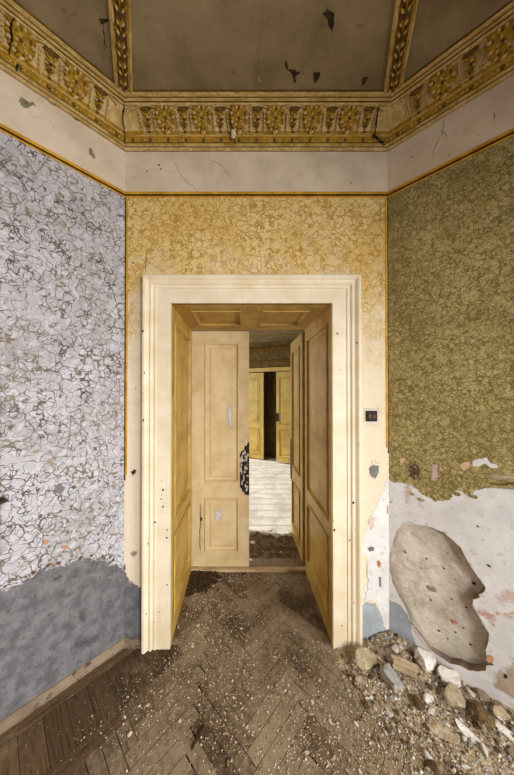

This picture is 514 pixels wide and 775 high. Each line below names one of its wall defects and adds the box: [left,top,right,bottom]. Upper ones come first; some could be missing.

crack [8,18,18,72]
peeling [285,61,320,83]
peeling [323,9,334,31]
crack [372,101,386,145]
peeling [353,457,514,710]
flaking render [0,554,147,720]